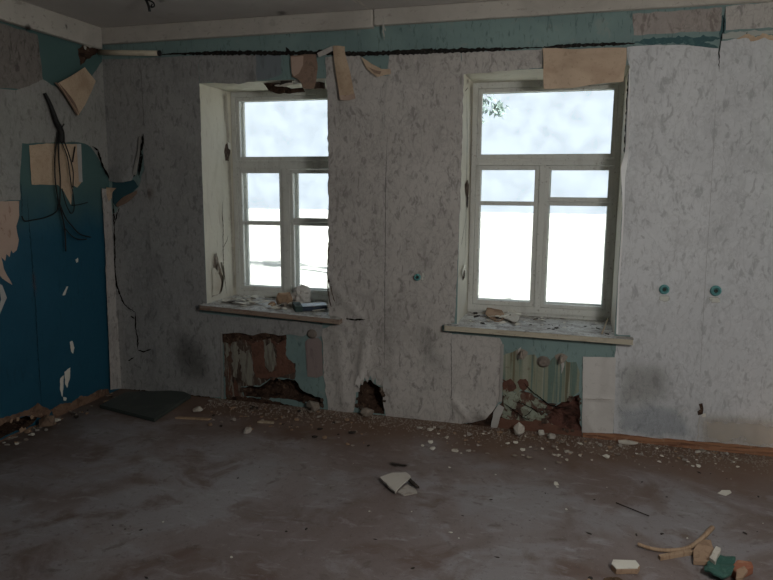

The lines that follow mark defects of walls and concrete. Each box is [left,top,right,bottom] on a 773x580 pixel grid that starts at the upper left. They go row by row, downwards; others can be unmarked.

spalling [78,45,100,66]
crack [162,8,726,66]
crack [112,196,151,361]
spalling [0,368,109,442]
spalling [222,333,324,408]
spalling [355,380,386,414]
peeling [463,347,582,436]